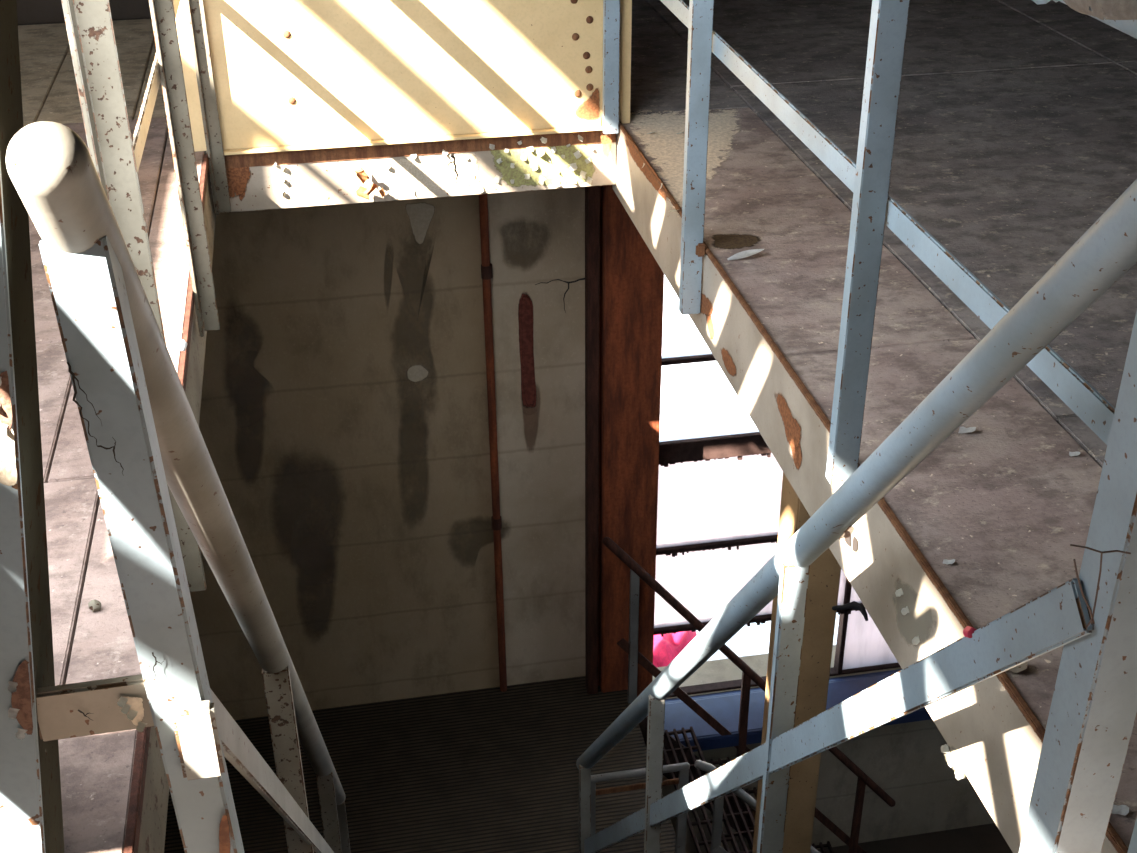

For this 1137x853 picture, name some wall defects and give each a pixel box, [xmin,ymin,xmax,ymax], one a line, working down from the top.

peeling [1032,0,1137,20]
rust [224,88,616,201]
peeling [0,371,17,486]
crack [66,362,124,476]
leakage [225,307,270,481]
leakage [384,239,435,522]
rust [518,293,536,408]
rust [775,393,802,470]
leakage [274,458,342,637]
peeling [7,660,33,739]